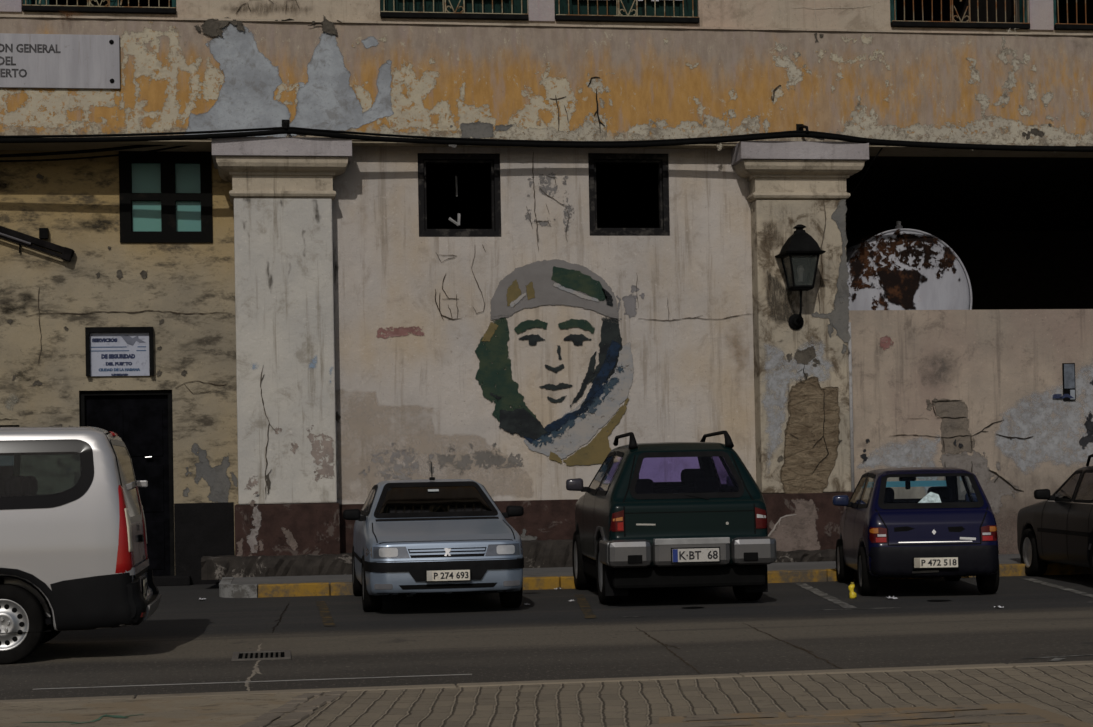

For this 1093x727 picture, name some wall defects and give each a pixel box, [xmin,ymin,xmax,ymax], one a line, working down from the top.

peeling [0,21,224,138]
spalling [194,17,245,37]
spalling [312,16,338,35]
peeling [376,58,770,151]
peeling [771,28,1093,154]
crack [260,368,276,500]
spalling [768,346,842,551]
spalling [926,399,1021,515]
spalling [1079,413,1093,449]